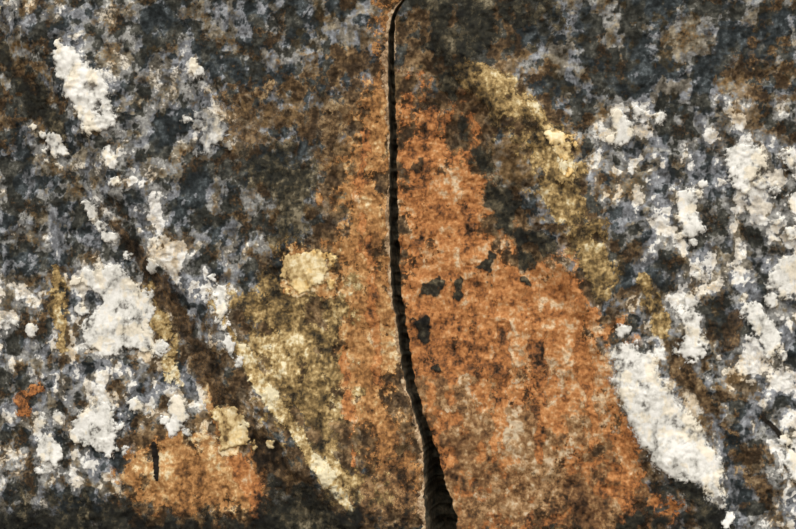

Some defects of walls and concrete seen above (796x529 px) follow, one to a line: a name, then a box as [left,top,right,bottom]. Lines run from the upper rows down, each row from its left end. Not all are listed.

rust [108,383,268,528]
crack [379,0,458,529]
rust [315,0,690,529]